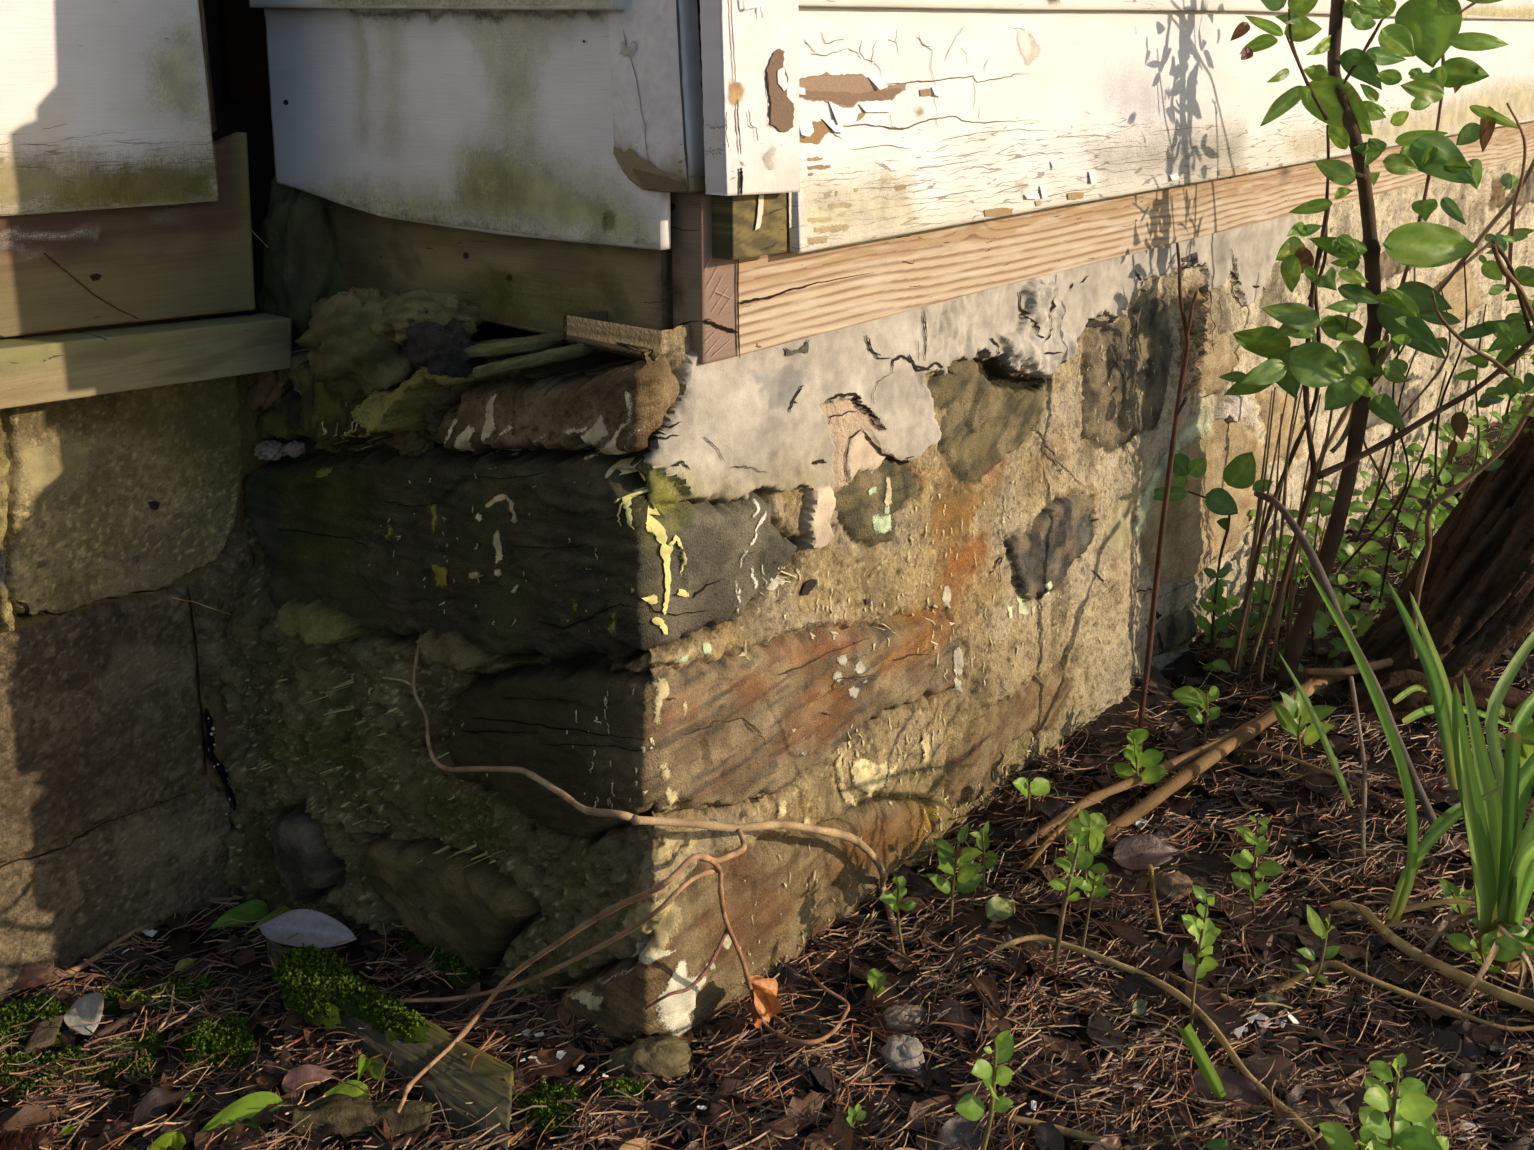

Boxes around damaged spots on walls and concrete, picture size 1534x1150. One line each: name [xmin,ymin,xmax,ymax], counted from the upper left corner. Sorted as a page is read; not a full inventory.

water stain [354,9,592,22]
peeling [766,48,943,176]
crack [805,0,1223,213]
water stain [344,150,639,242]
peeling [807,188,858,245]
spalling [785,339,810,356]
spalling [973,357,1046,391]
spalling [820,395,897,490]
water stain [432,565,447,587]
crack [537,578,725,630]
crack [0,539,237,869]